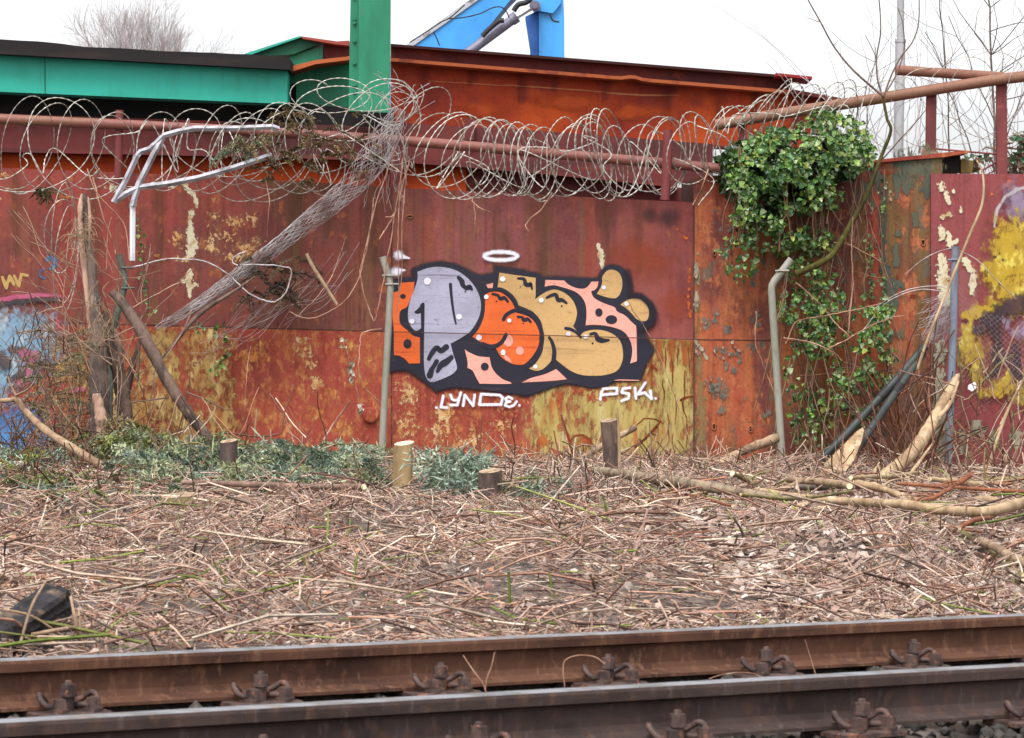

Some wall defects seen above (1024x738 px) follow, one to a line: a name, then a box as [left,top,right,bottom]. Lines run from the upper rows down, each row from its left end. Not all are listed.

corrosion [461,104,501,117]
corrosion [541,95,665,119]
peeling [168,183,199,298]
corrosion [204,211,267,263]
peeling [860,142,963,343]
peeling [961,257,977,296]
corrosion [123,327,275,443]
corrosion [292,333,353,433]
corrosion [395,377,483,452]
corrosion [493,339,693,461]
peeling [693,252,744,416]